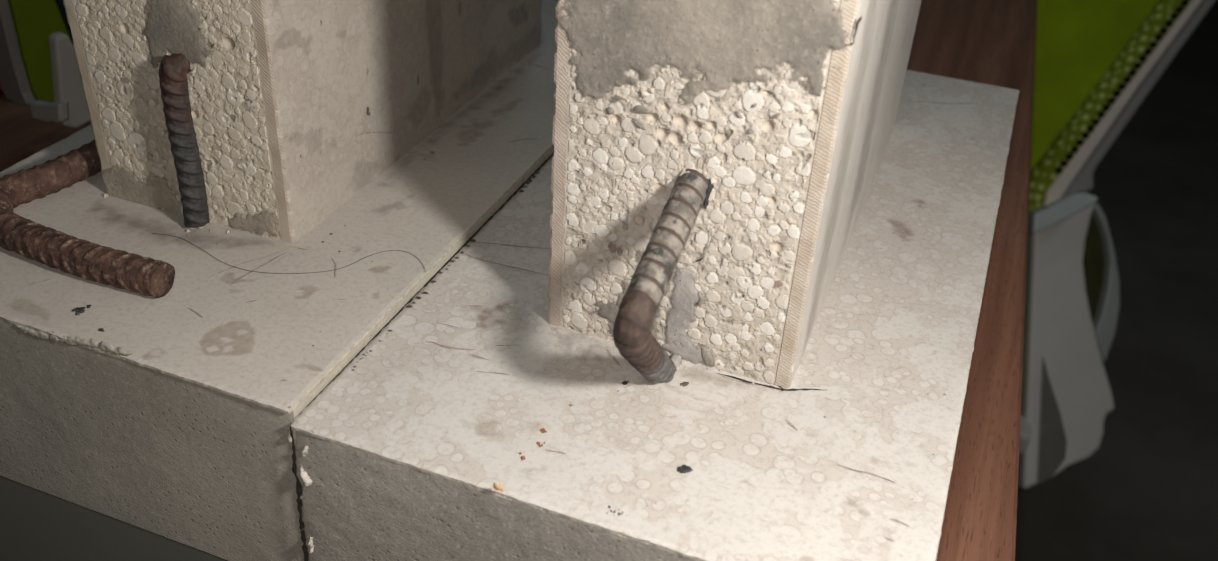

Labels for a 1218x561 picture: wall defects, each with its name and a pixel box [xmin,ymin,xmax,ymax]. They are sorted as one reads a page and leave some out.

peeling [632,82,655,130]
spalling [679,167,717,209]
crack [290,138,554,561]
peeling [670,345,722,386]